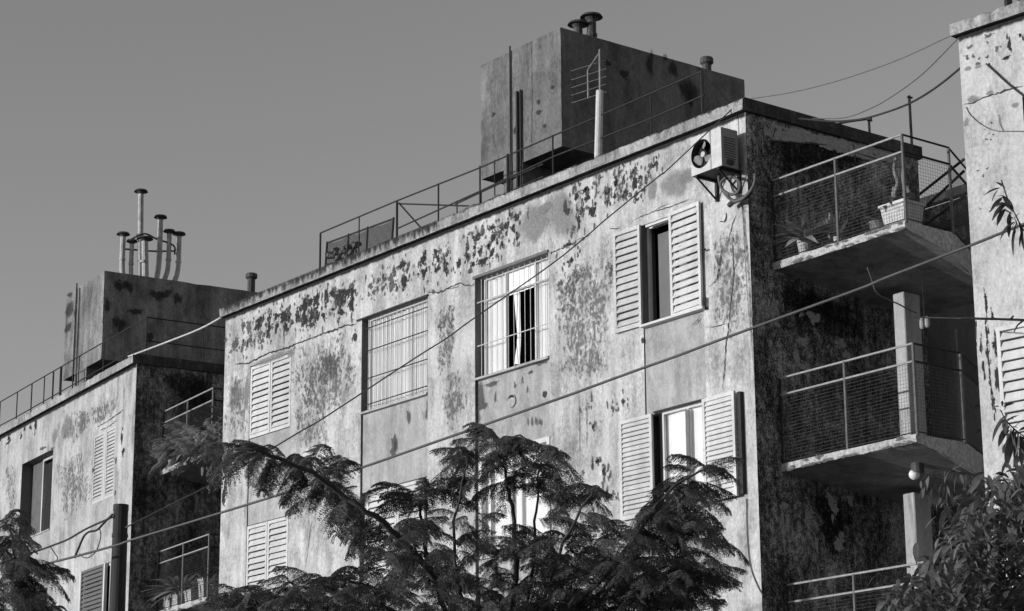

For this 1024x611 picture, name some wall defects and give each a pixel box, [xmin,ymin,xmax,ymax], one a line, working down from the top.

peeling [964,33,1024,68]
crack [967,86,1022,104]
peeling [551,153,663,271]
water stain [770,138,867,173]
peeling [224,203,528,359]
water stain [436,305,497,429]
water stain [553,252,613,381]
water stain [783,286,866,343]
water stain [53,403,116,519]
water stain [805,491,854,555]